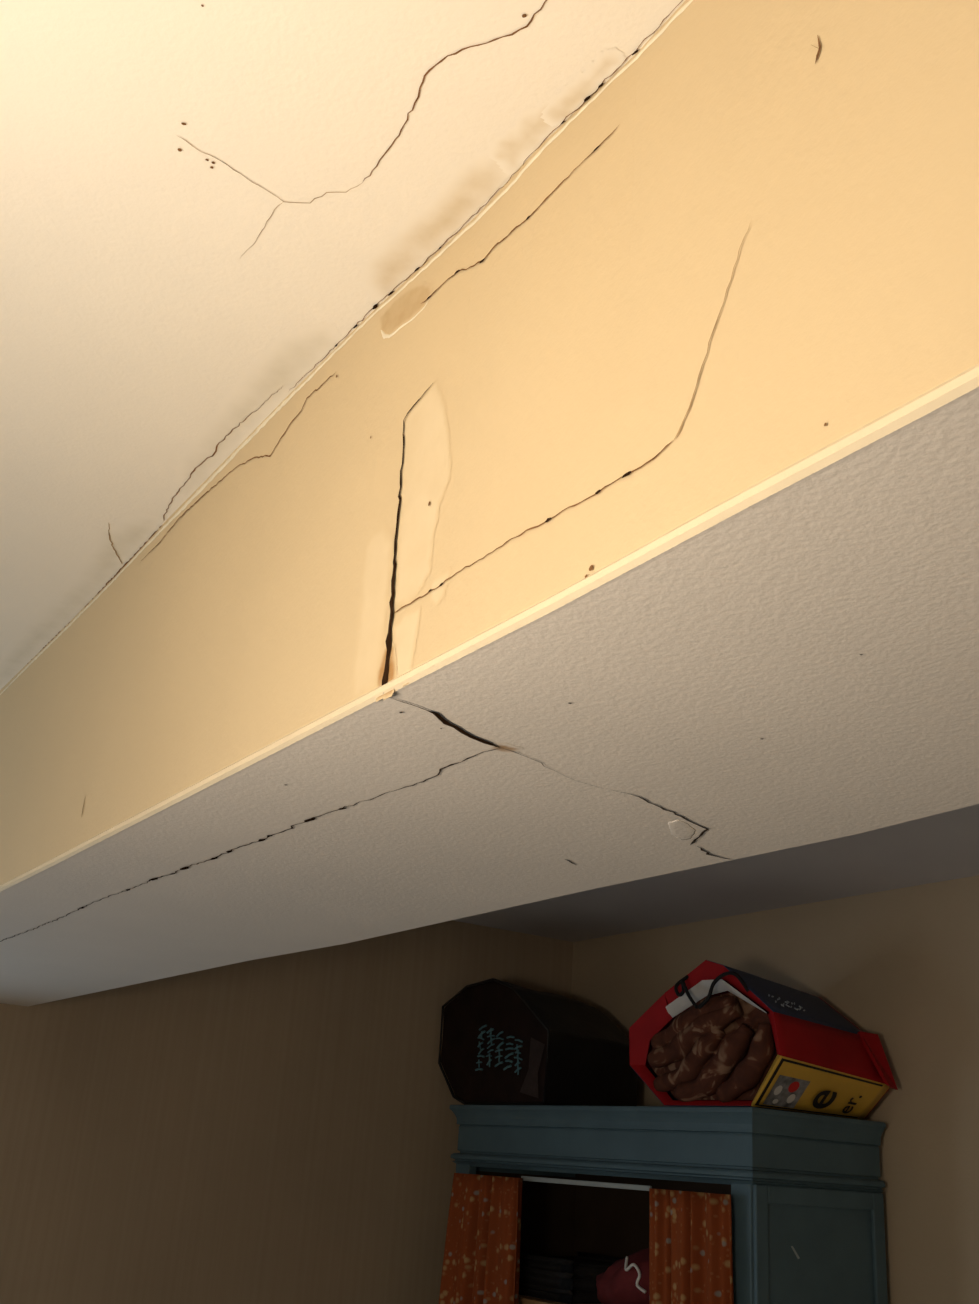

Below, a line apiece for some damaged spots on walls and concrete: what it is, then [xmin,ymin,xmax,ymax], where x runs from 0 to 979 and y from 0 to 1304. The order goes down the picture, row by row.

crack [12,0,683,679]
crack [0,222,751,942]